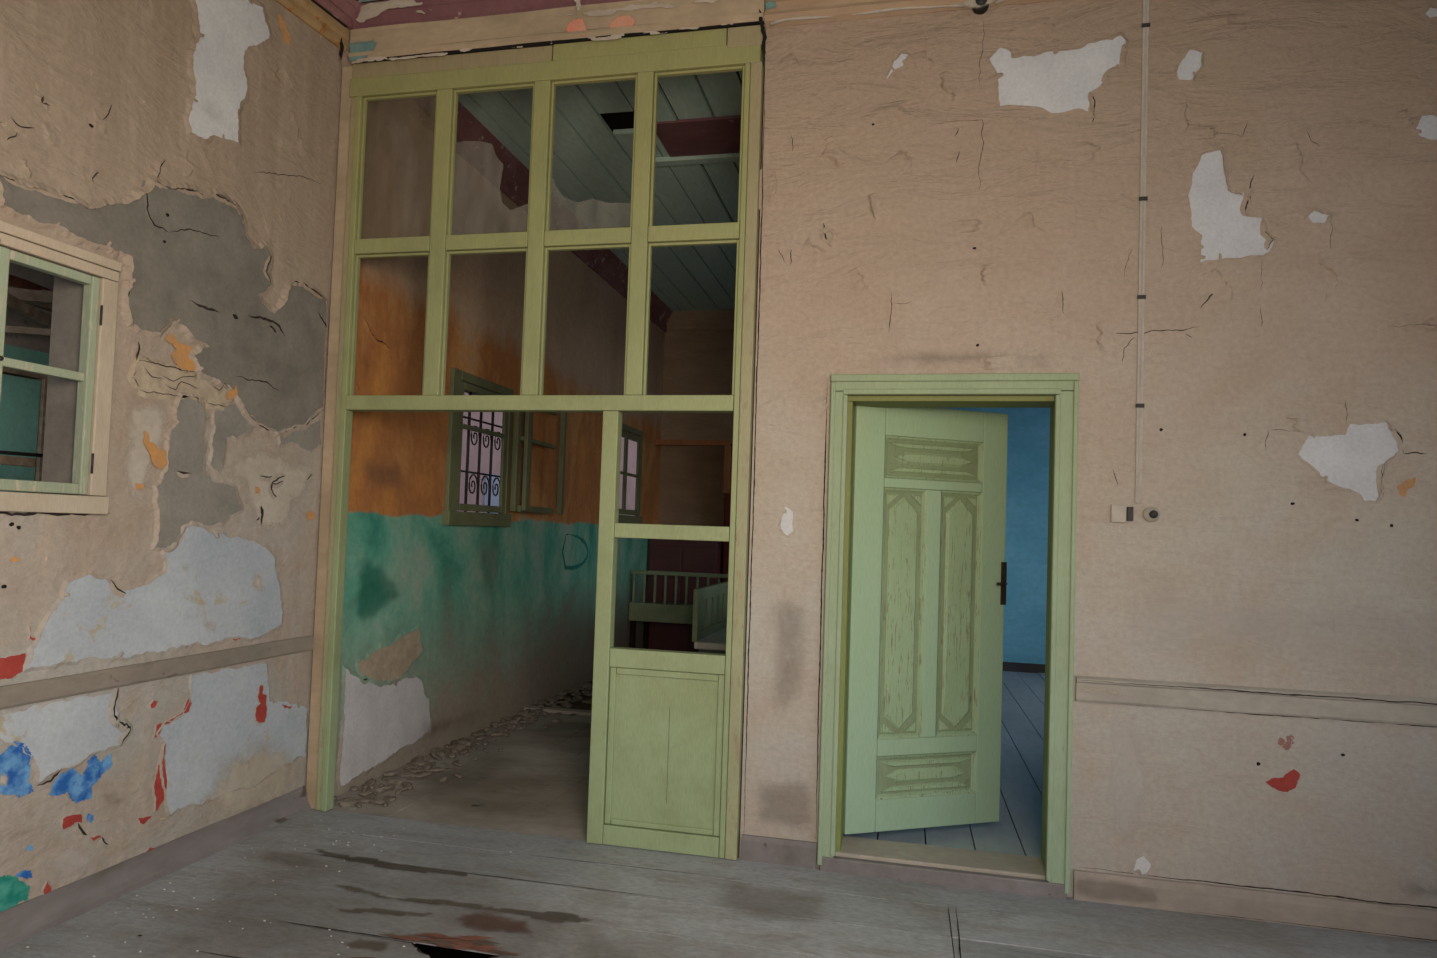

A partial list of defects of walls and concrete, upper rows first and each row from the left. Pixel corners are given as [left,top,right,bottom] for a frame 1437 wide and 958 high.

peeling [183,0,291,148]
peeling [986,32,1129,116]
peeling [1174,47,1205,84]
peeling [1411,112,1437,143]
peeling [1185,147,1277,265]
spalling [0,170,329,682]
peeling [1295,419,1406,504]
peeling [0,688,133,843]
peeling [136,660,309,826]
peeling [336,624,433,791]
peeling [0,870,53,912]